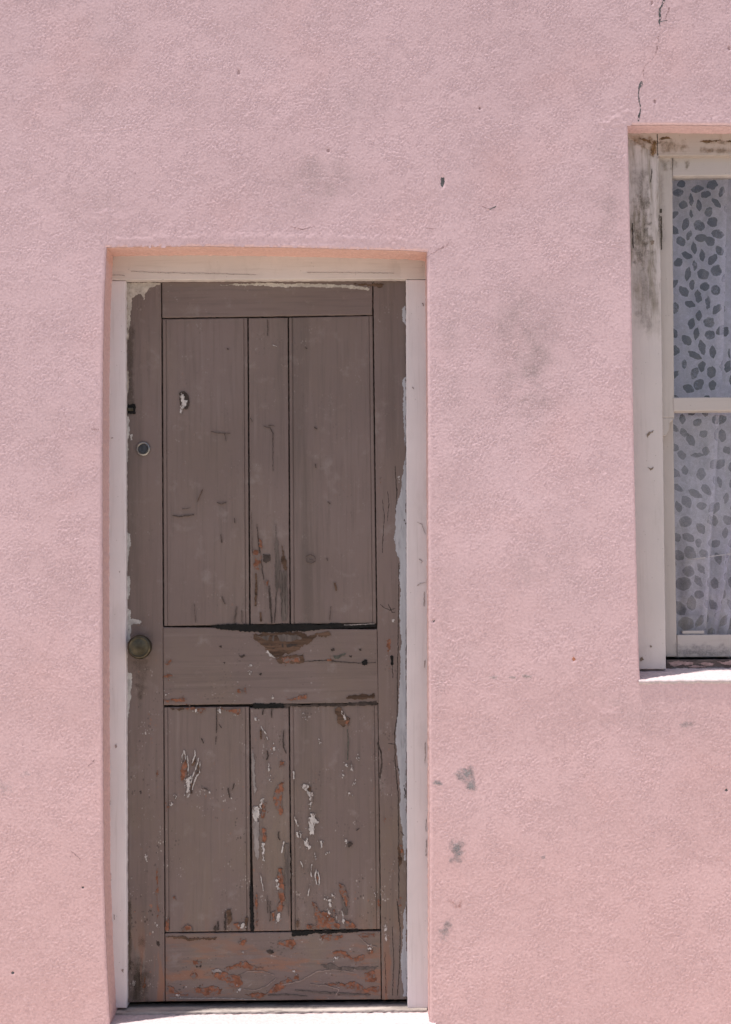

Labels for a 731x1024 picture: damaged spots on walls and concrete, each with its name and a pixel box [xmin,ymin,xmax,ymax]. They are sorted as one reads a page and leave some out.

crack [638,0,670,182]
crack [657,209,665,250]
peeling [179,391,190,414]
peeling [253,526,331,666]
peeling [144,693,388,1000]